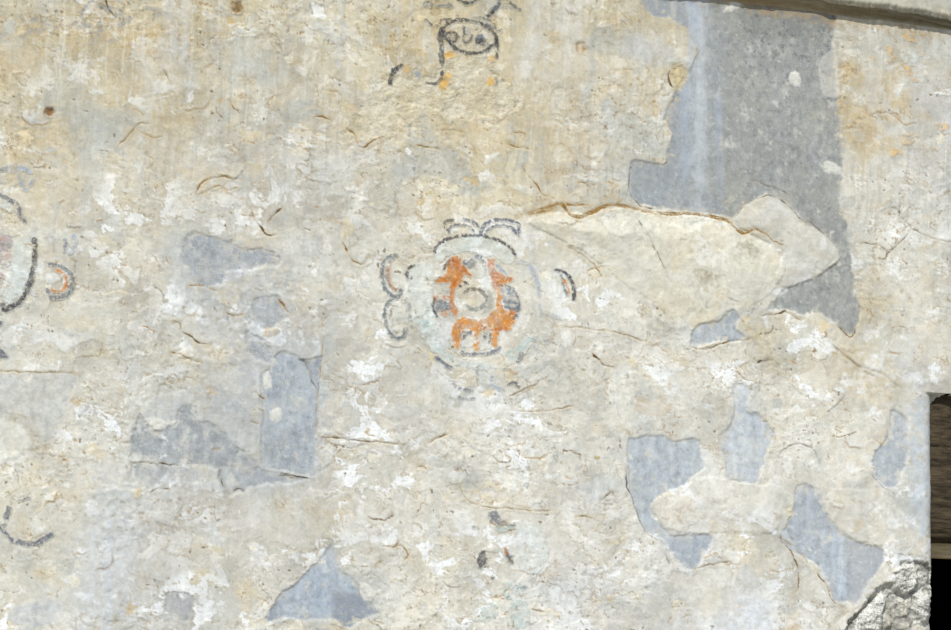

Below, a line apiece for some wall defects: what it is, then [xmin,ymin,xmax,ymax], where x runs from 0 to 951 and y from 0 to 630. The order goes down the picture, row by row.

peeling [174,227,283,288]
crack [501,128,951,293]
peeling [625,0,863,335]
peeling [127,293,326,504]
peeling [264,537,382,630]
peeling [577,378,777,577]
peeling [776,482,931,630]
peeling [870,405,910,490]